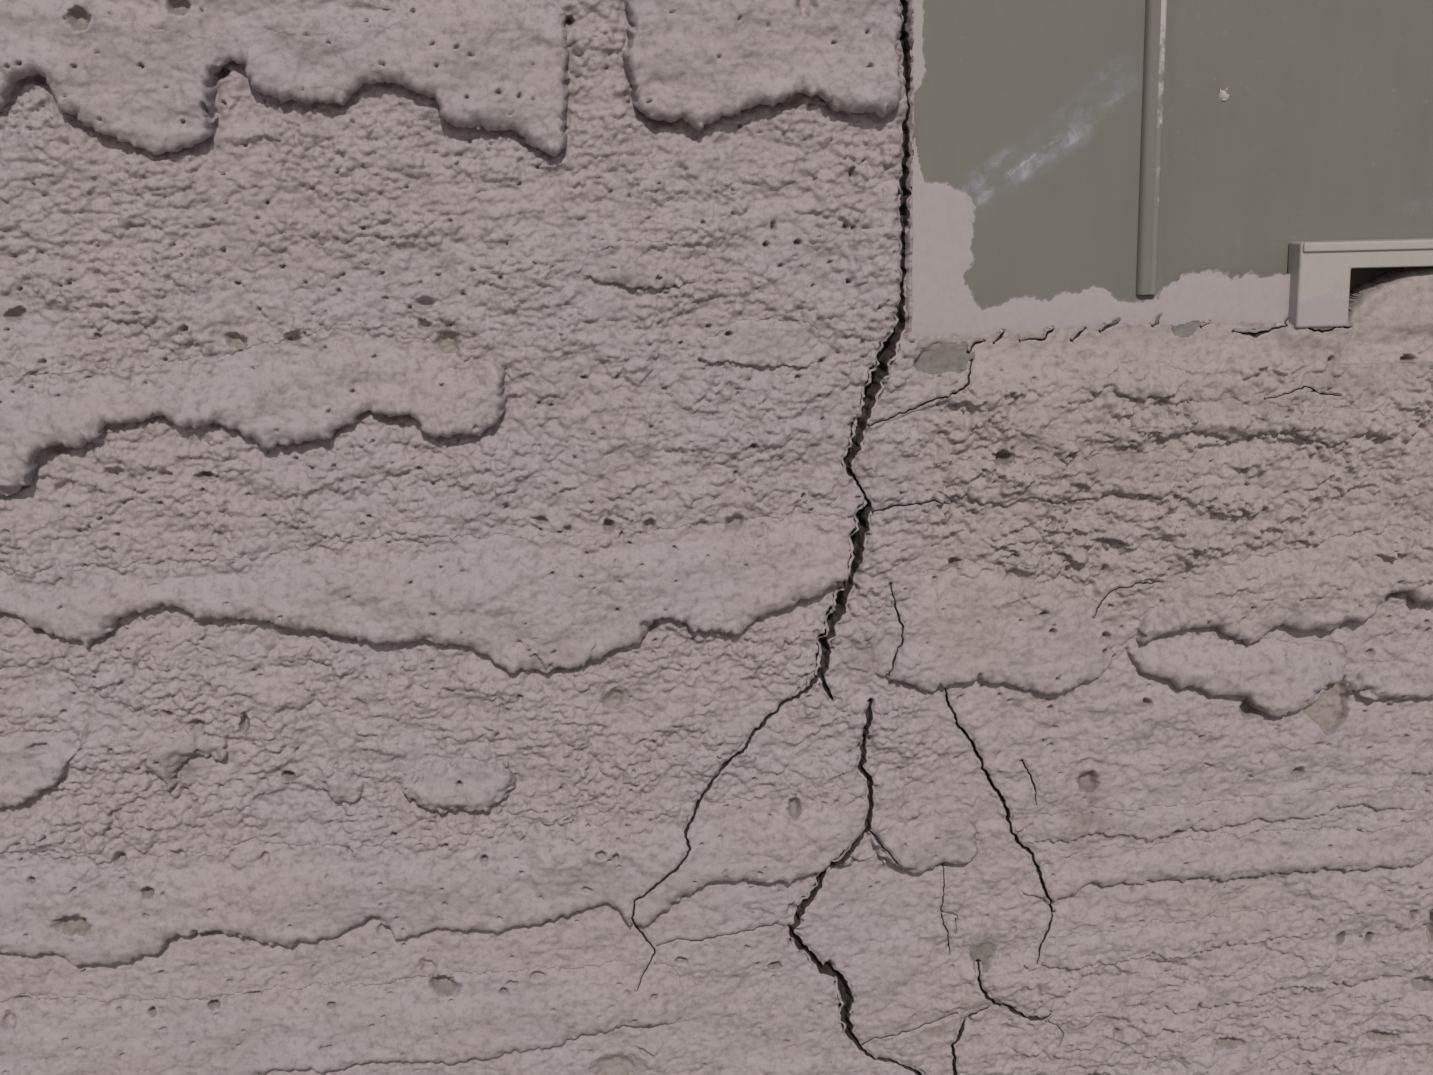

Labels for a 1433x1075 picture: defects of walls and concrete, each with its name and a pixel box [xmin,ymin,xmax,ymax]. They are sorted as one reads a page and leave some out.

peeling [1170,321,1201,337]
crack [1200,314,1352,341]
crack [1265,383,1340,401]
crack [629,0,1163,1075]